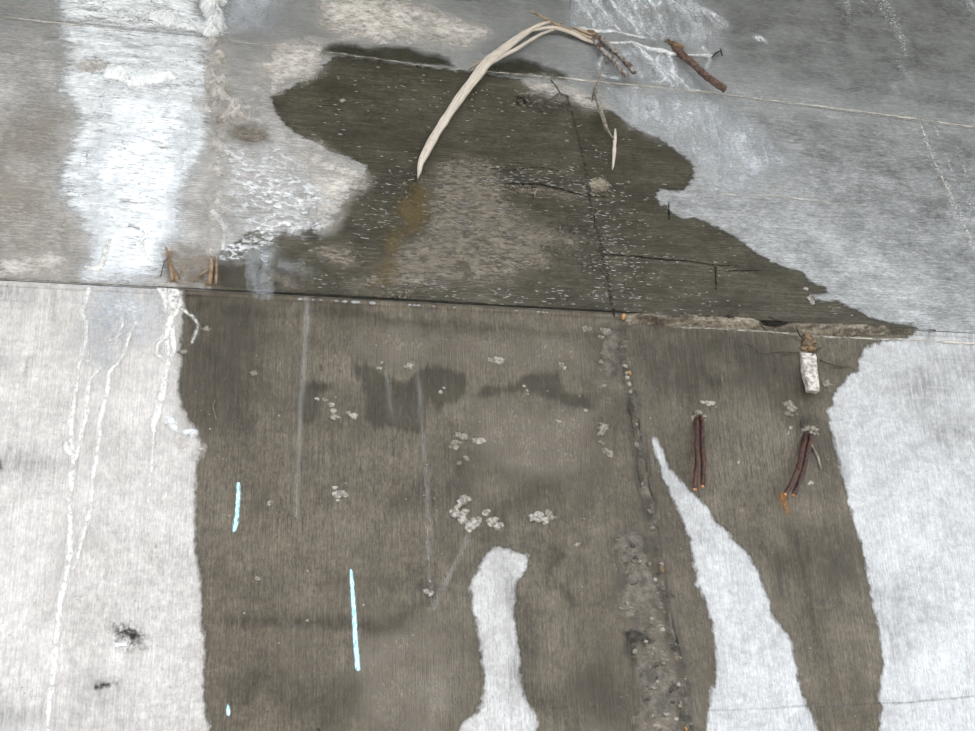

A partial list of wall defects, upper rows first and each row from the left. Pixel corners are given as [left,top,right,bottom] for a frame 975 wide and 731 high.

water stain [56,0,274,283]
water stain [178,0,917,731]
crack [492,167,607,199]
crack [605,254,769,290]